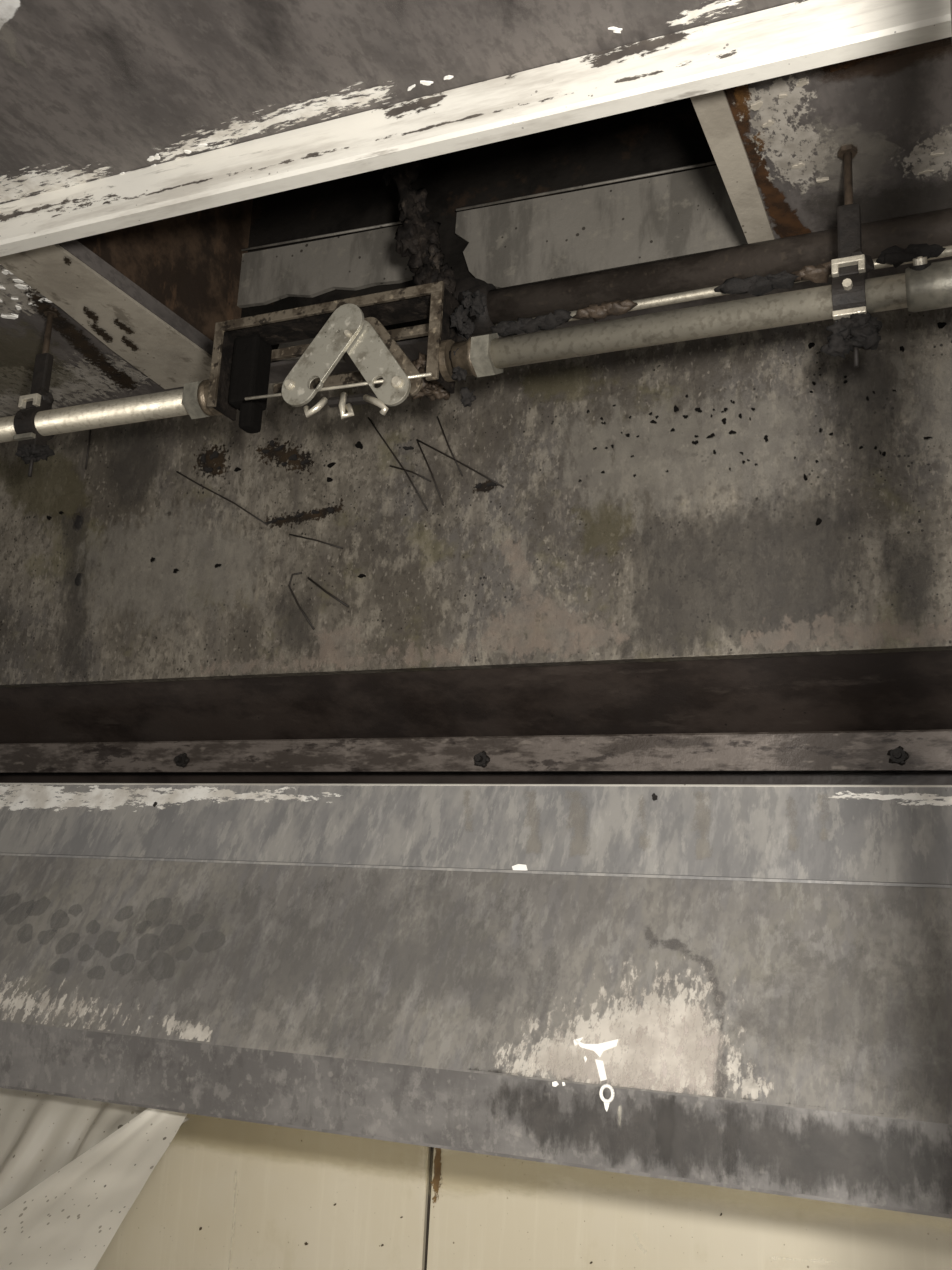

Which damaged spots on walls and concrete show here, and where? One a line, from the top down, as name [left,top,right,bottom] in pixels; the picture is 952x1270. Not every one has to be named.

peeling [407,75,453,91]
corrosion [724,84,812,238]
peeling [739,75,843,196]
peeling [891,123,952,181]
peeling [495,961,774,1101]
corrosion [430,1148,443,1207]